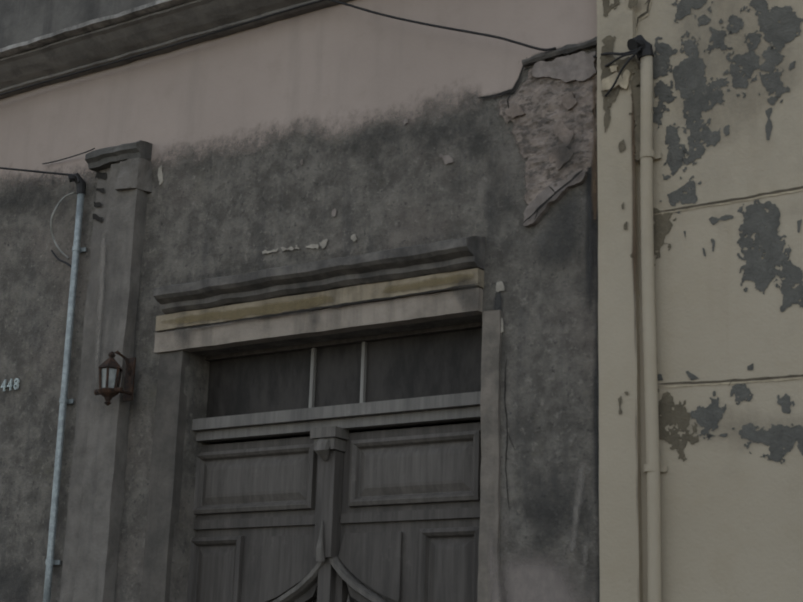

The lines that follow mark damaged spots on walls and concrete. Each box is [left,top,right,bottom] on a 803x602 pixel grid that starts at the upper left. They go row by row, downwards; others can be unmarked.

peeling [602,0,638,17]
crack [636,0,652,31]
spalling [498,35,640,228]
peeling [653,0,803,266]
spalling [262,239,328,254]
damp [153,236,486,323]
peeling [709,199,803,312]
damp [586,166,599,527]
peeling [657,374,803,464]